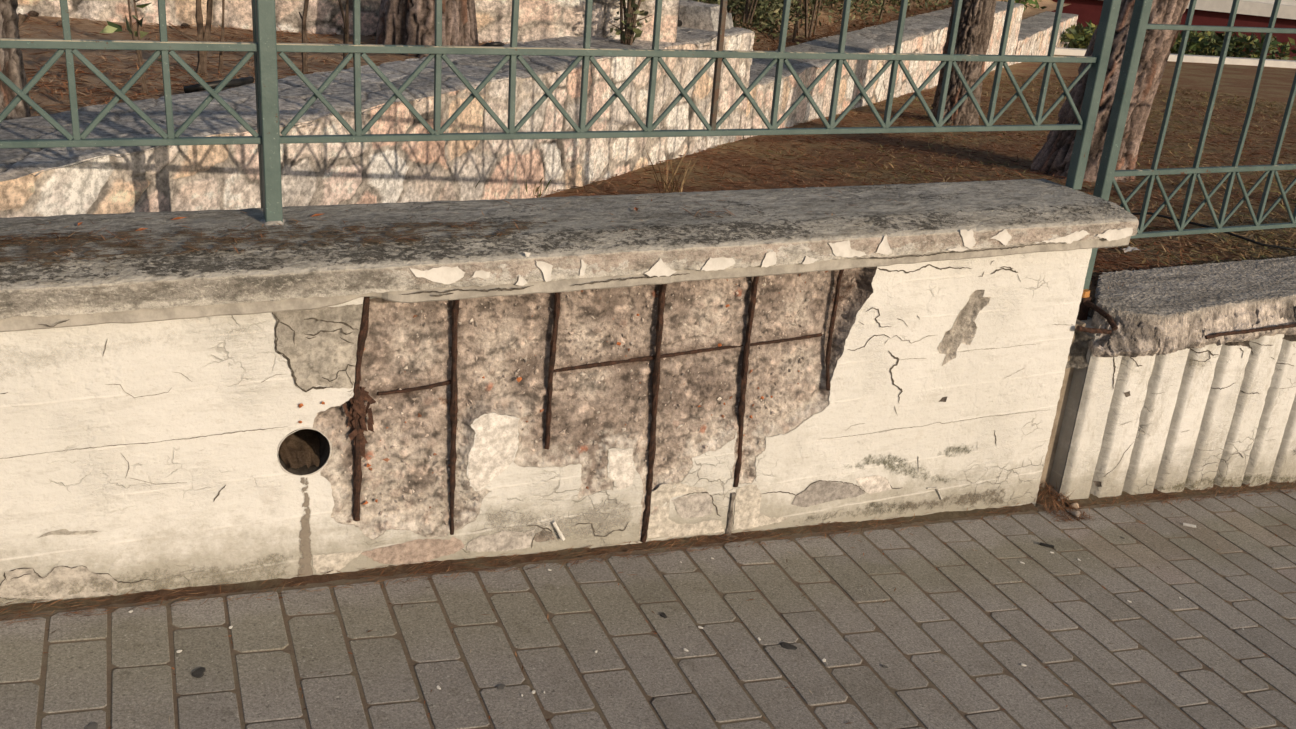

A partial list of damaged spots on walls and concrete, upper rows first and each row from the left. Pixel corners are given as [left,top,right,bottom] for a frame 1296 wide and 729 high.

peeling [948,229,1012,252]
peeling [1035,227,1133,244]
crack [861,243,1061,282]
spalling [938,290,991,366]
crack [823,307,1067,443]
spalling [313,235,892,565]
crack [763,467,919,495]